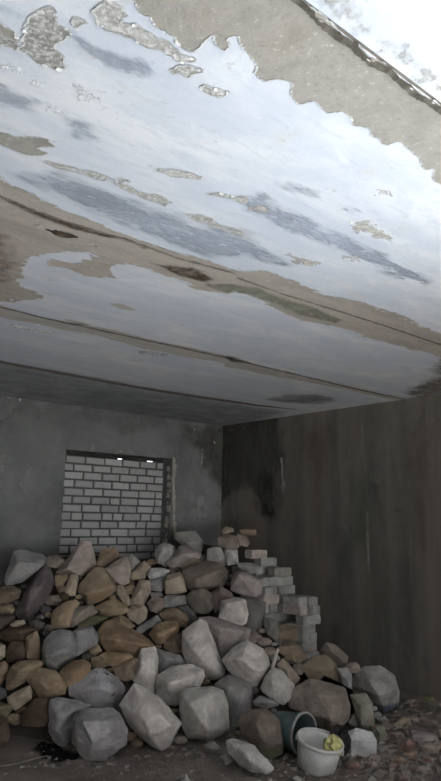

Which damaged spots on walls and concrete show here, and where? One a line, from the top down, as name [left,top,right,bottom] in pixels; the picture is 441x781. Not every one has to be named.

peeling [0,0,441,185]
peeling [0,131,173,207]
damp [51,178,267,258]
damp [246,195,428,283]
peeling [0,176,441,400]
damp [407,366,441,397]
damp [186,418,285,516]